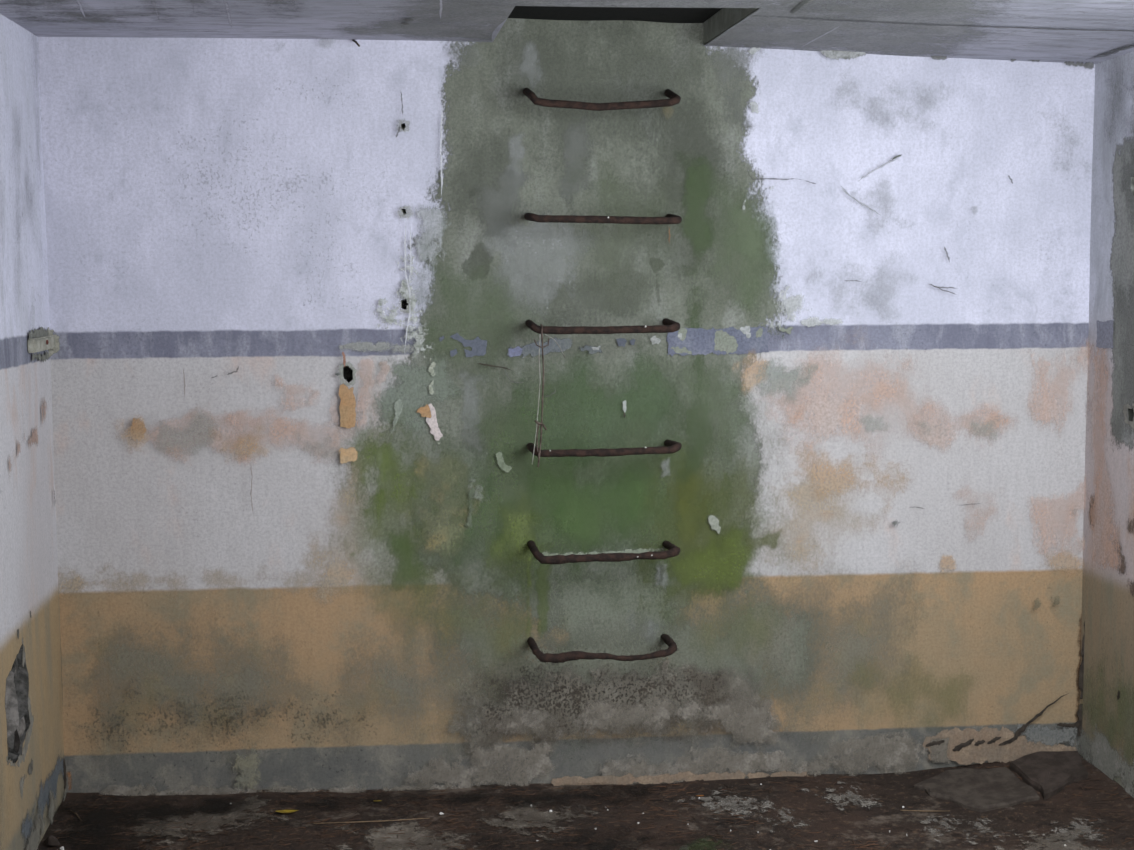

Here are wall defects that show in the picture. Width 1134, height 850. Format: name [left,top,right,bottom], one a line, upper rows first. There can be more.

water stain [93,0,1000,752]
water stain [1110,124,1134,450]
spalling [5,629,67,850]
crack [926,617,1085,751]